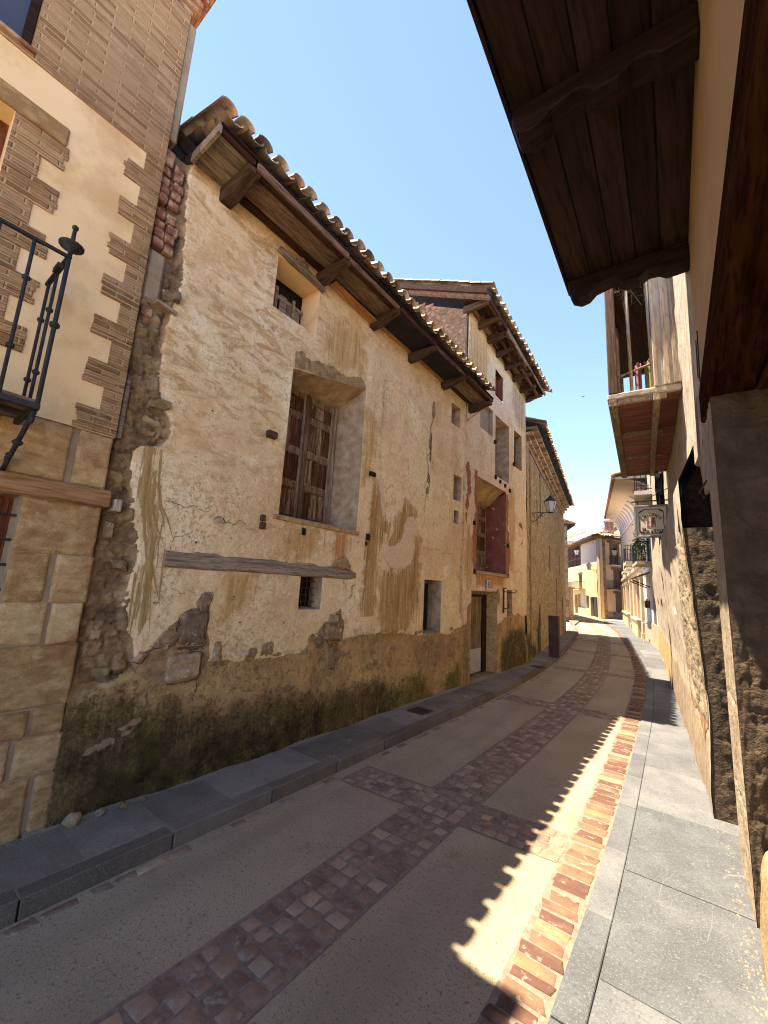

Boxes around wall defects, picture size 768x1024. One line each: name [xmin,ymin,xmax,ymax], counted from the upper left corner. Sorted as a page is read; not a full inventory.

flaking render [141,399,172,437]
crack [423,402,485,648]
spalling [128,592,229,685]
spalling [300,609,361,675]